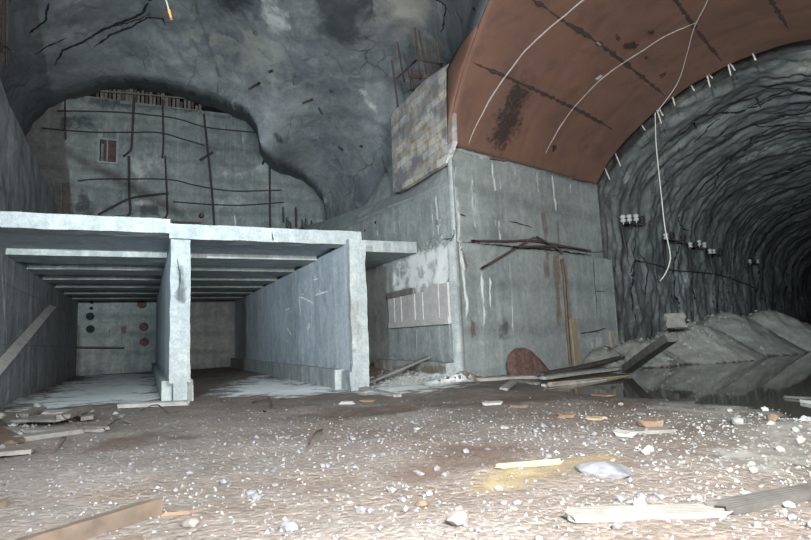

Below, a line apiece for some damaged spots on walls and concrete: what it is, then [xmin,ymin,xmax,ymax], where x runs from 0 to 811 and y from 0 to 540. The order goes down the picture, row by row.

crack [29,0,166,66]
water stain [316,0,372,41]